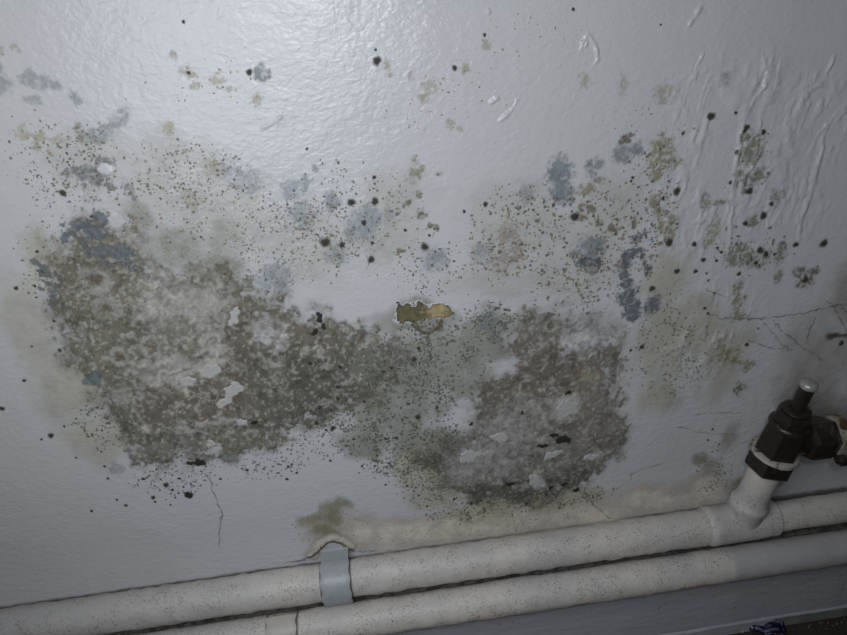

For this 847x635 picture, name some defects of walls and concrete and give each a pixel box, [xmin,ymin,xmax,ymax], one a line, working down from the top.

damp [213,60,271,103]
mould [725,125,771,194]
damp [701,192,798,319]
mould [794,266,818,288]
damp [13,109,759,550]
peeling [392,299,455,335]